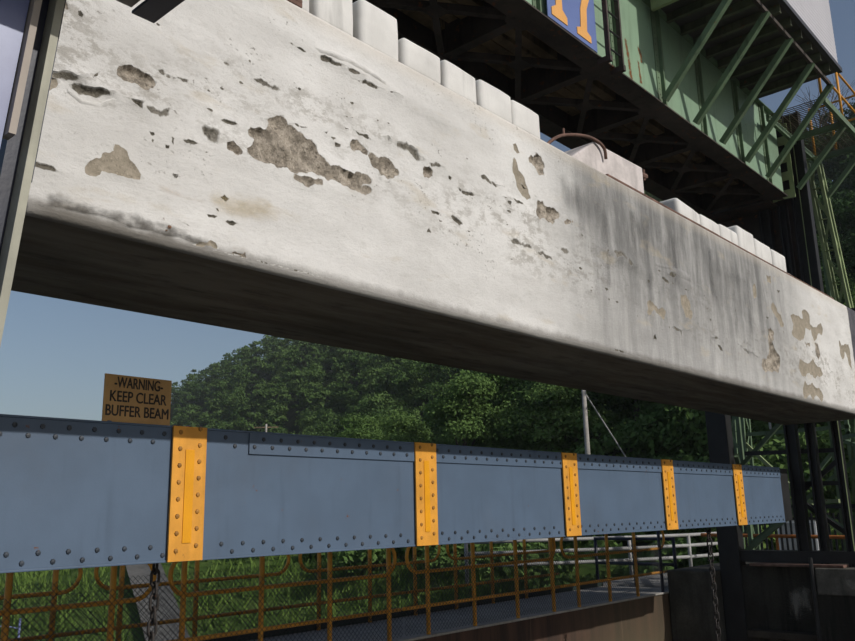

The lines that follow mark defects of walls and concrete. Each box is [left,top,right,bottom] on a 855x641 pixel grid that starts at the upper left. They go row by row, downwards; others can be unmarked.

spalling [116,64,158,90]
peeling [84,143,145,181]
spalling [201,114,400,196]
spalling [512,144,583,236]
peeling [761,303,825,402]
peeling [839,340,852,369]